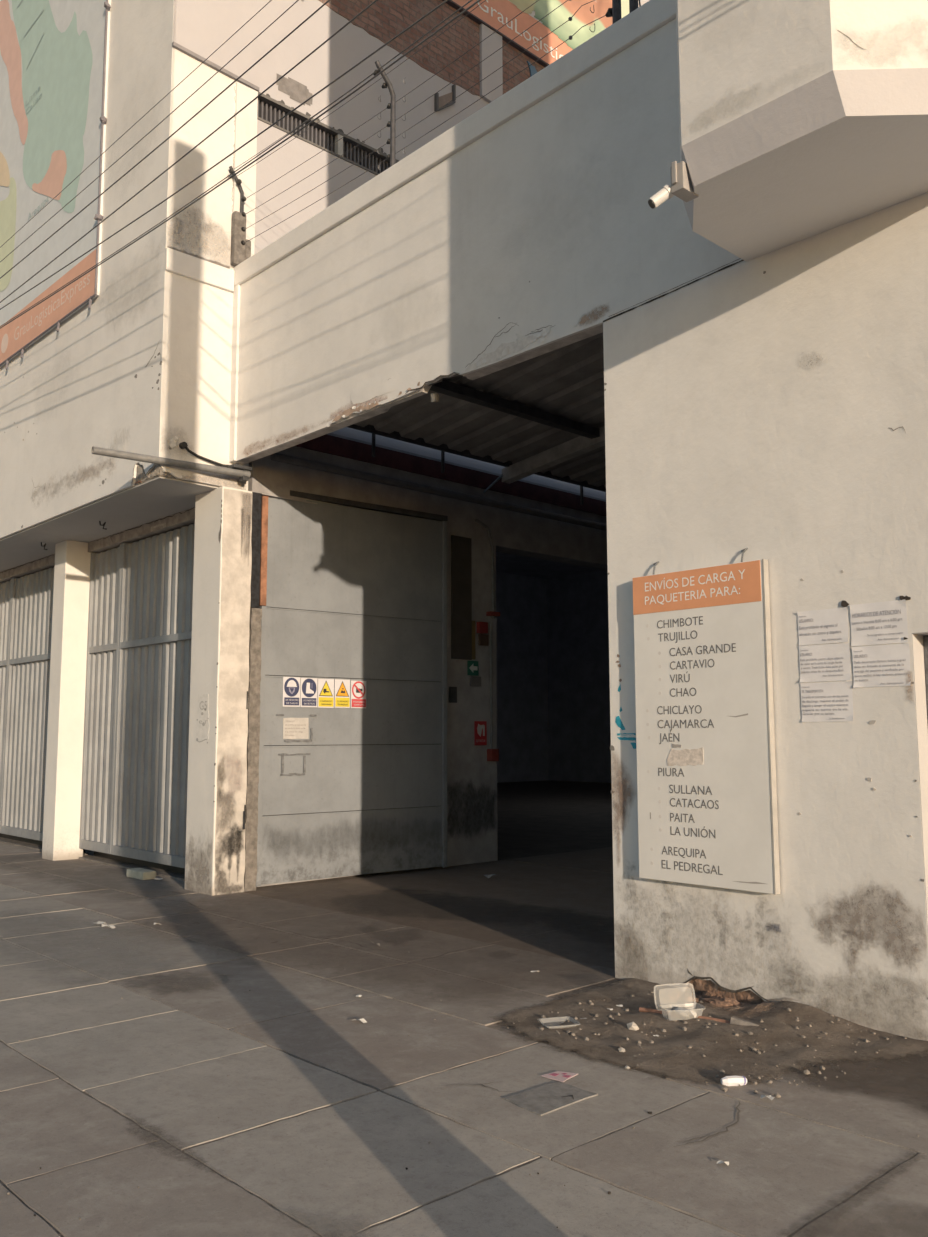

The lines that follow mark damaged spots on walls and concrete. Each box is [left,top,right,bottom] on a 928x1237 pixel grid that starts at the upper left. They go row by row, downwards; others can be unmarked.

flaking render [319,0,480,96]
peeling [399,327,550,395]
water stain [614,766,631,814]
water stain [188,765,242,894]
mould [818,888,921,964]
spalling [668,978,787,1026]
crack [673,1102,740,1147]